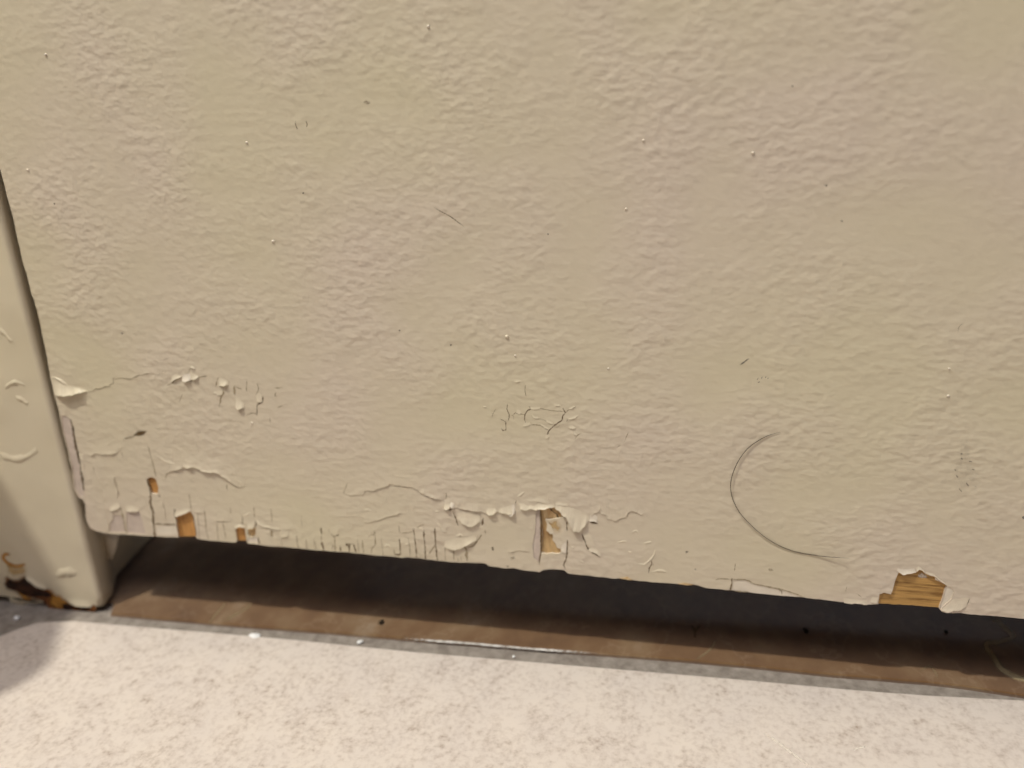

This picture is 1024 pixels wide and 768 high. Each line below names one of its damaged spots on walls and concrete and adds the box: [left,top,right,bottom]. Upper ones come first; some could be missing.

peeling [51,364,283,416]
crack [483,379,581,439]
crack [148,447,231,541]
peeling [103,503,197,559]
peeling [235,518,271,545]
crack [281,517,447,561]
peeling [419,483,612,568]
peeling [844,566,969,613]